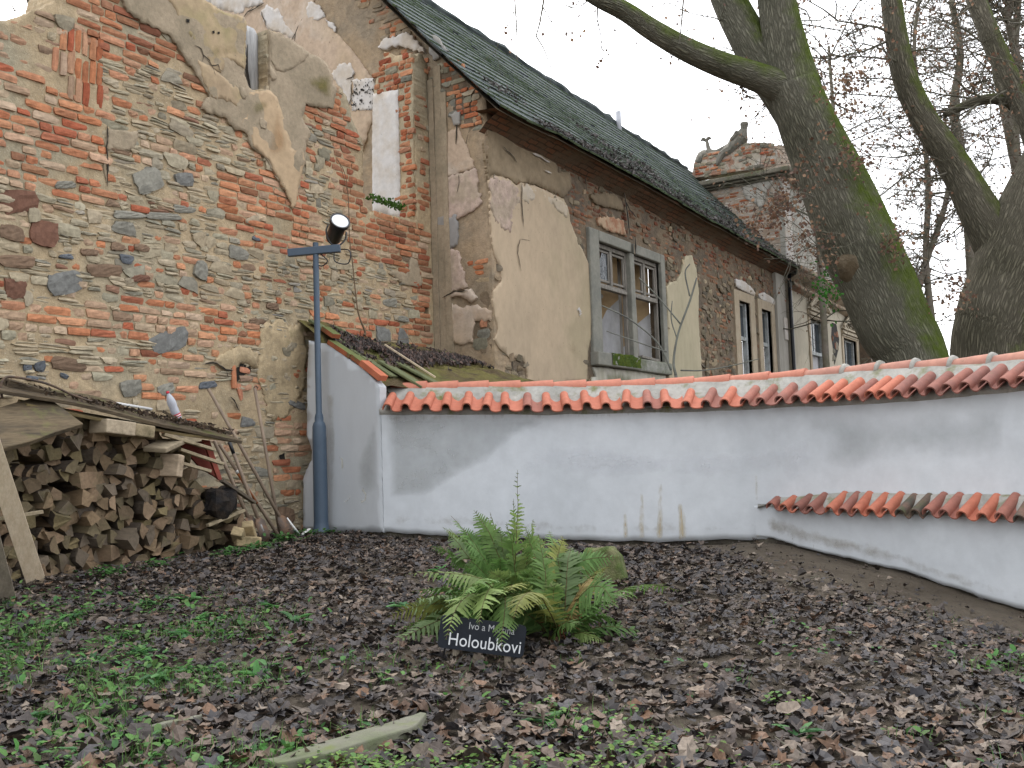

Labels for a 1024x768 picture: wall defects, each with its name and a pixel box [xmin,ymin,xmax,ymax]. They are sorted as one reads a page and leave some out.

crack [102,126,110,185]
flaking render [108,128,139,151]
flaking render [121,0,375,209]
flaking render [378,32,775,382]